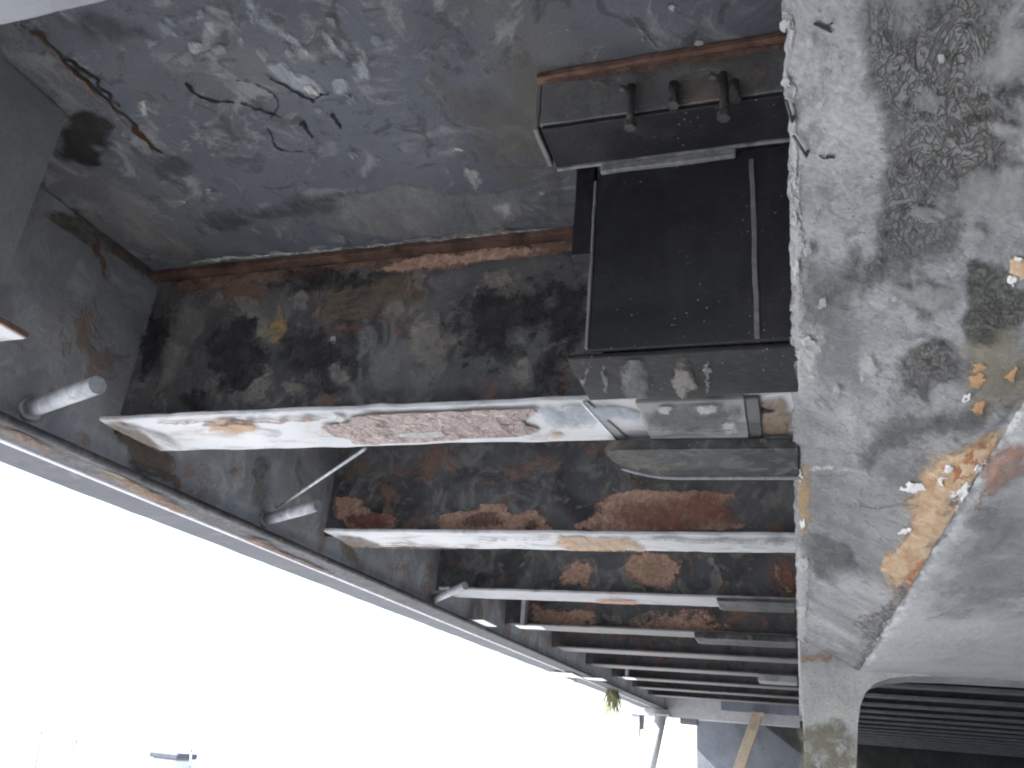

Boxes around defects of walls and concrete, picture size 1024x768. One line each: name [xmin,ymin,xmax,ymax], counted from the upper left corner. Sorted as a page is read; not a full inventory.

damp [4,47,114,166]
crack [21,25,163,154]
crack [185,78,341,153]
damp [795,0,1024,380]
corrosion [171,240,572,320]
peeling [321,408,539,445]
damp [672,362,712,398]
damp [900,339,959,399]
corrosion [333,473,796,631]
spalling [853,431,1001,670]